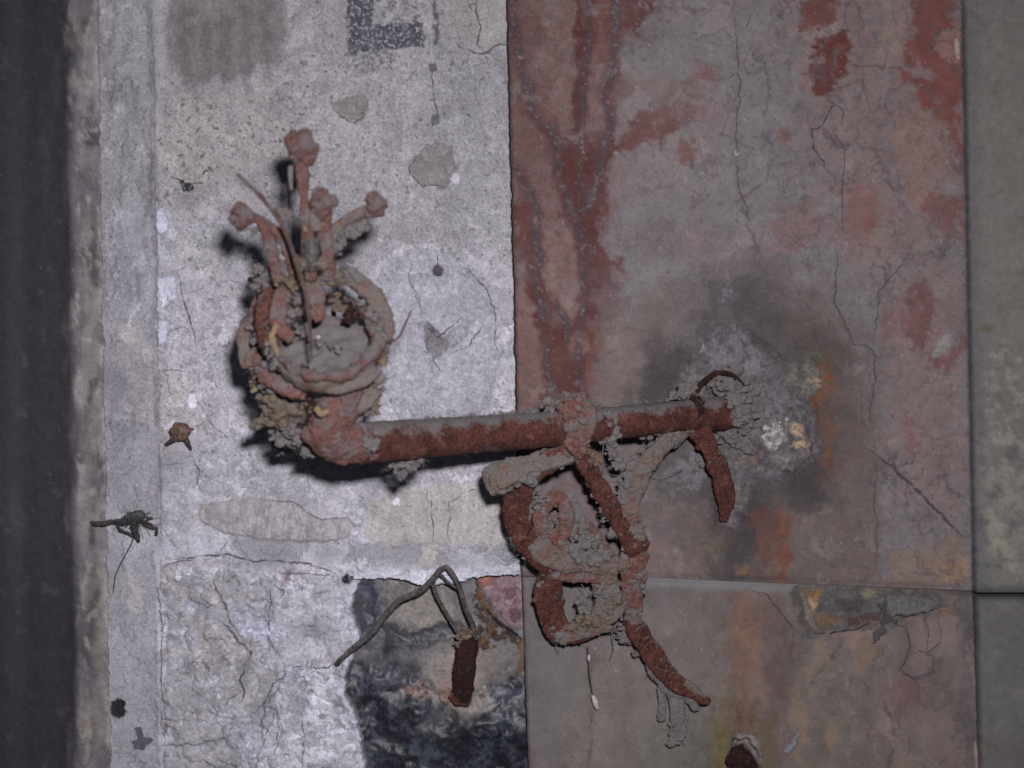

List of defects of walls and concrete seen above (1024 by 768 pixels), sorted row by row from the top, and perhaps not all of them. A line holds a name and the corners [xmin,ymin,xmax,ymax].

water stain [168,0,284,83]
crack [718,1,761,255]
crack [811,95,963,563]
corrosion [473,587,523,675]
spalling [791,584,944,644]